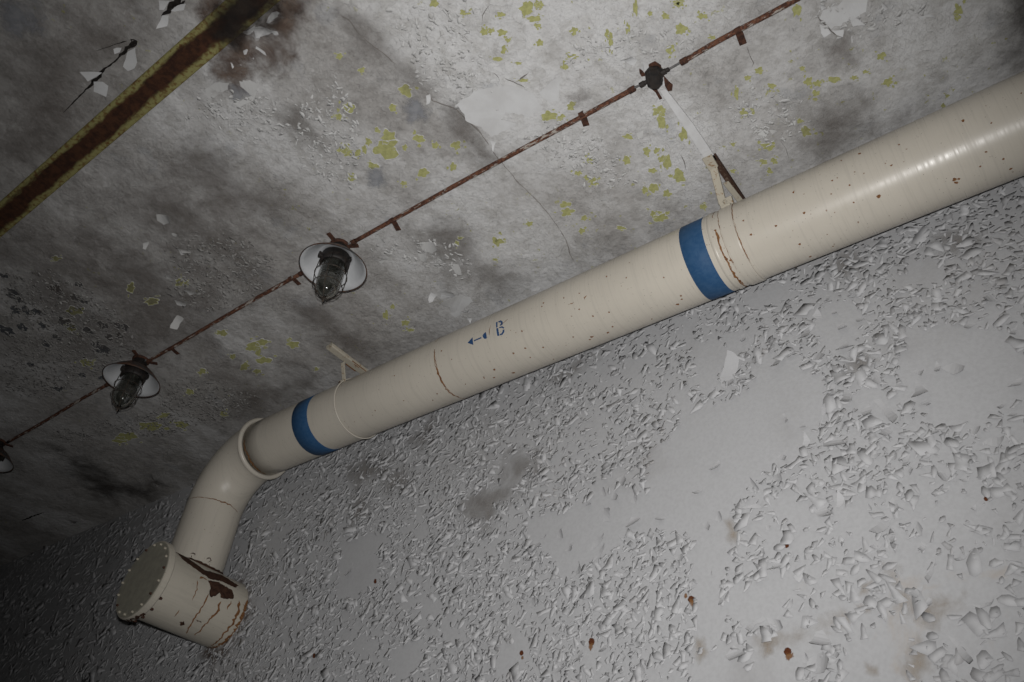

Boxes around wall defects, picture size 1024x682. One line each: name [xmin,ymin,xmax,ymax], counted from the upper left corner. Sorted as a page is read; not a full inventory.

crack [63,39,137,113]
crack [161,0,185,16]
rust [212,0,303,85]
peeling [184,11,467,190]
crack [427,93,574,261]
peeling [386,0,716,225]
peeling [75,176,1024,682]